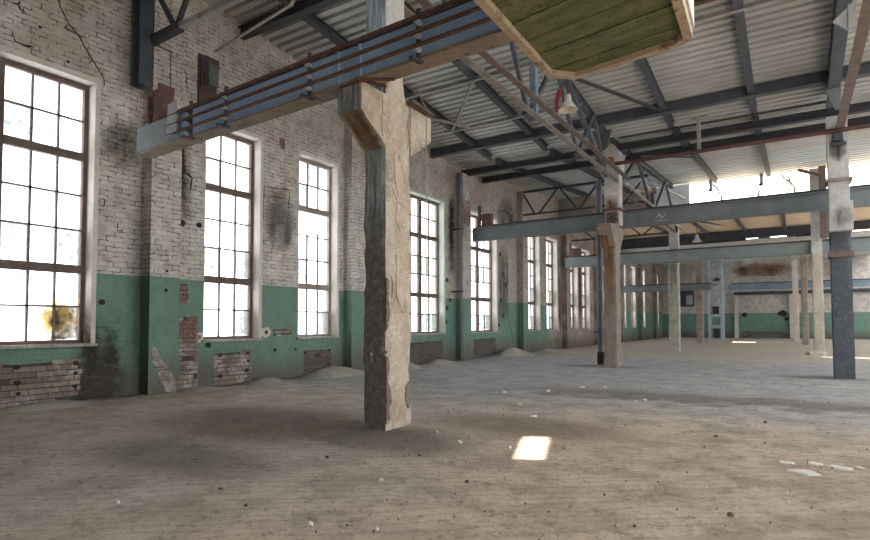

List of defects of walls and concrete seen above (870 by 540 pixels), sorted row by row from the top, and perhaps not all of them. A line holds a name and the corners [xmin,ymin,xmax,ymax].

crack [59,0,105,90]
damp [270,199,291,245]
corrosion [741,264,785,275]
flaking render [180,284,189,305]
damp [84,333,116,364]
flaking render [151,315,252,393]
flaking render [294,348,332,373]
flaking render [0,359,82,409]
spalling [370,351,393,424]